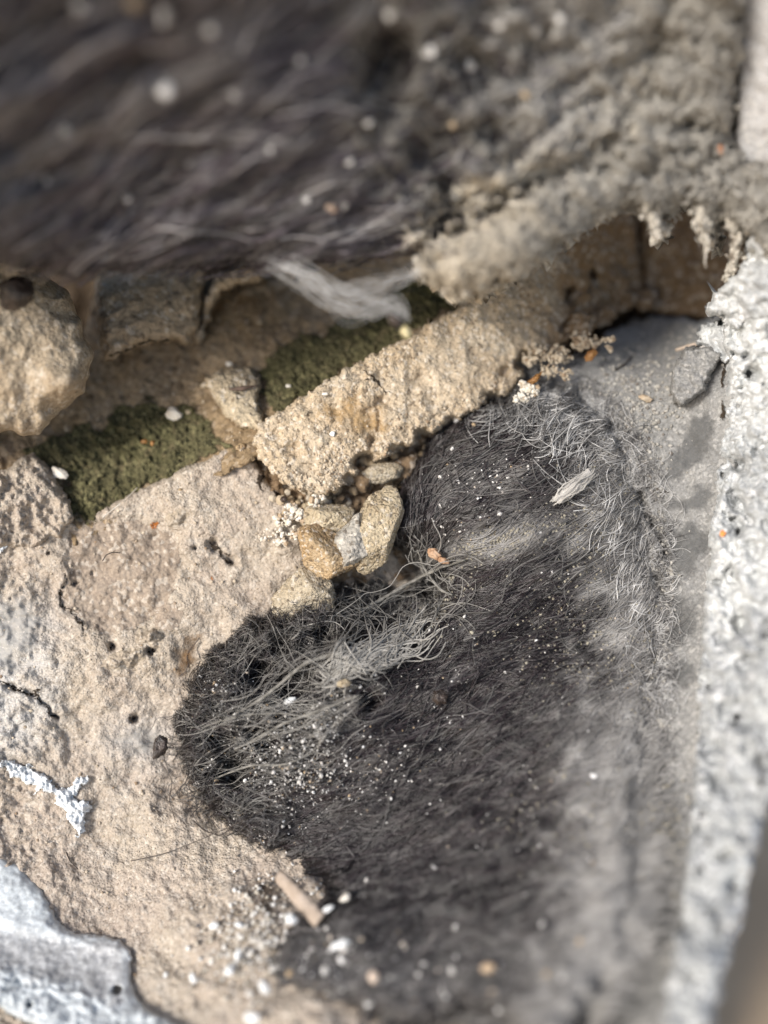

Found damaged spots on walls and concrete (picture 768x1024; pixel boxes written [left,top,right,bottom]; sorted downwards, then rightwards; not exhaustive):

peeling [427,548,450,565]
crack [1,681,56,717]